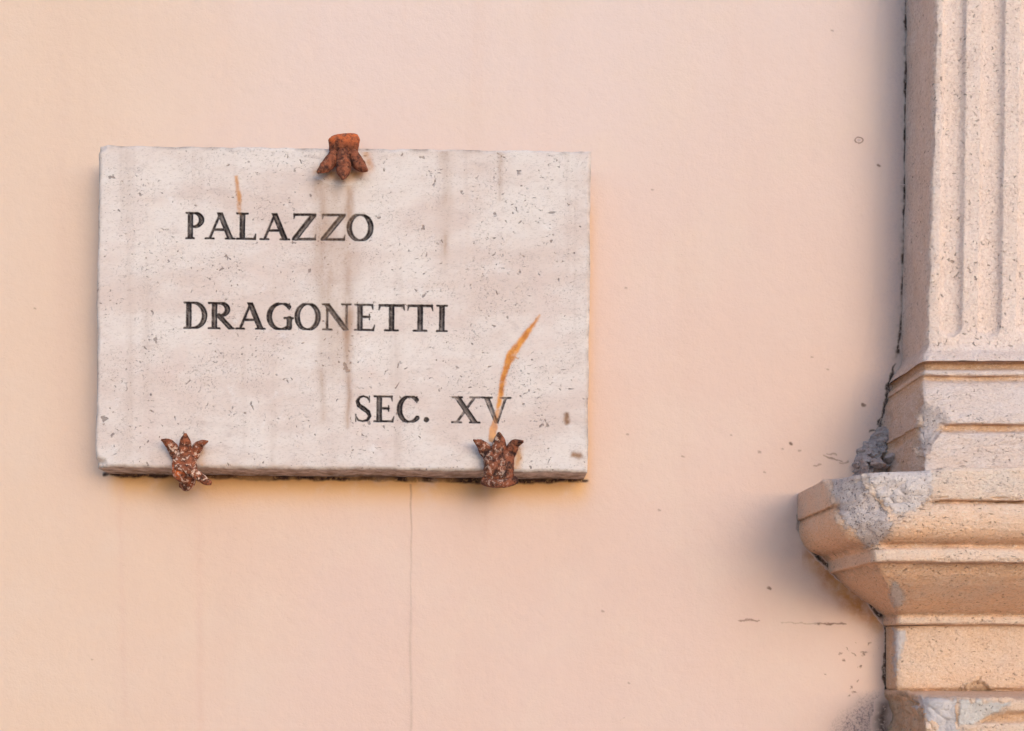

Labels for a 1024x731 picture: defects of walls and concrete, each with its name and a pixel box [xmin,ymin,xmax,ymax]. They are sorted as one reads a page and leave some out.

corrosion [233,174,244,217]
corrosion [309,152,377,186]
crack [867,0,907,434]
corrosion [487,312,542,444]
corrosion [197,445,208,466]
corrosion [514,438,526,469]
spalling [813,426,942,552]
crack [407,483,415,731]
crack [737,618,848,626]
crack [795,513,889,691]